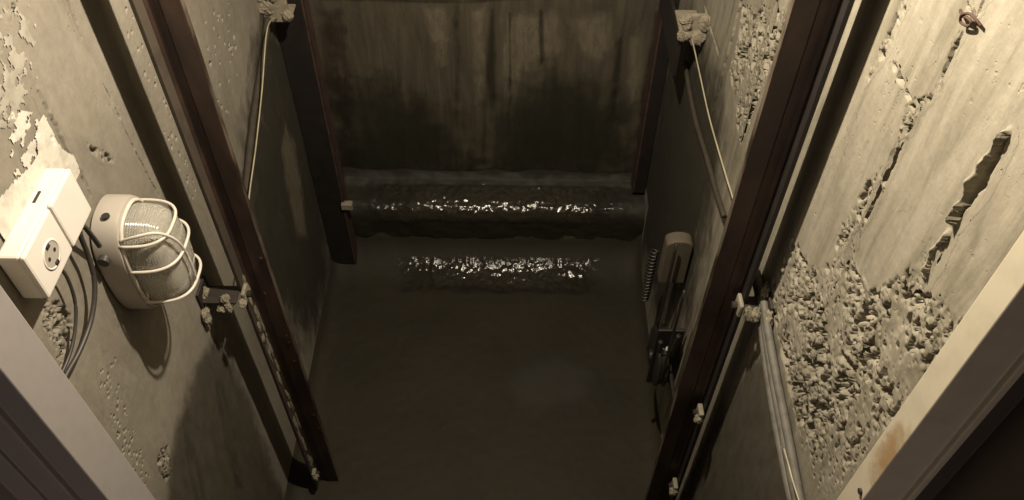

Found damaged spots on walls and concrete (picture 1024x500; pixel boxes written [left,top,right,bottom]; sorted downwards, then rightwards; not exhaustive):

peeling [0,0,80,240]
damp [342,87,471,171]
damp [424,7,448,66]
damp [472,7,627,173]
spalling [728,0,789,150]
spalling [769,78,1019,500]